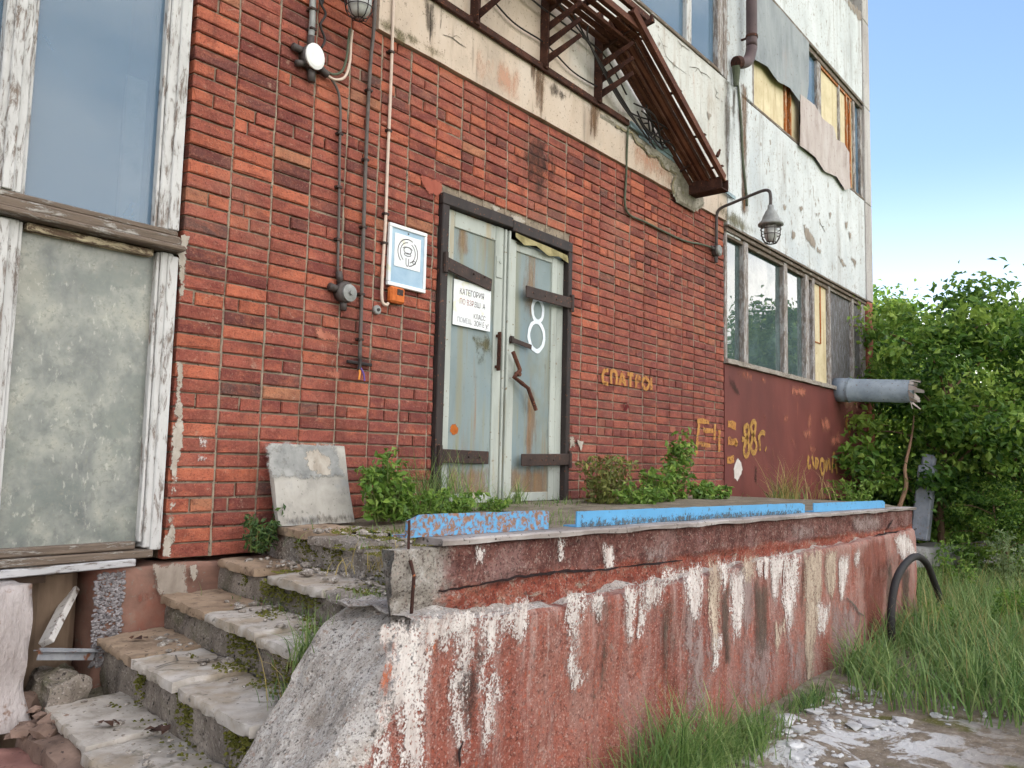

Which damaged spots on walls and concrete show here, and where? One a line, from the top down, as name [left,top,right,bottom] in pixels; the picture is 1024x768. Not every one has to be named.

spalling [600,113,705,212]
peeling [146,362,188,595]
damp [852,514,879,533]
crack [438,560,683,592]
damp [372,596,534,768]
damp [564,590,607,691]
damp [625,525,916,729]